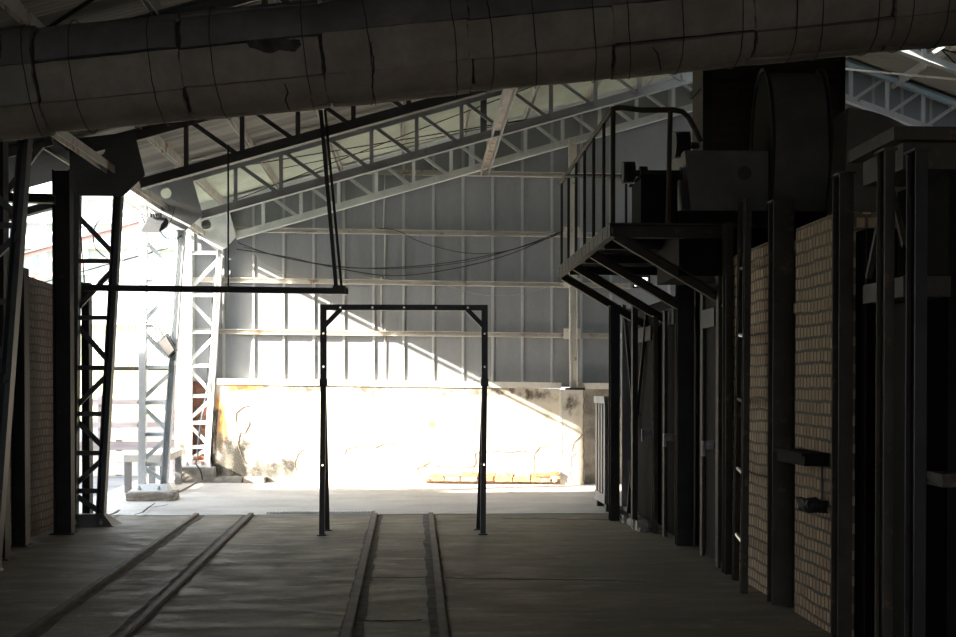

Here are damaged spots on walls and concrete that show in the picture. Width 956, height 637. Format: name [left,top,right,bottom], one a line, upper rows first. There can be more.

corrosion [216,384,263,440]
leakage [212,410,296,480]